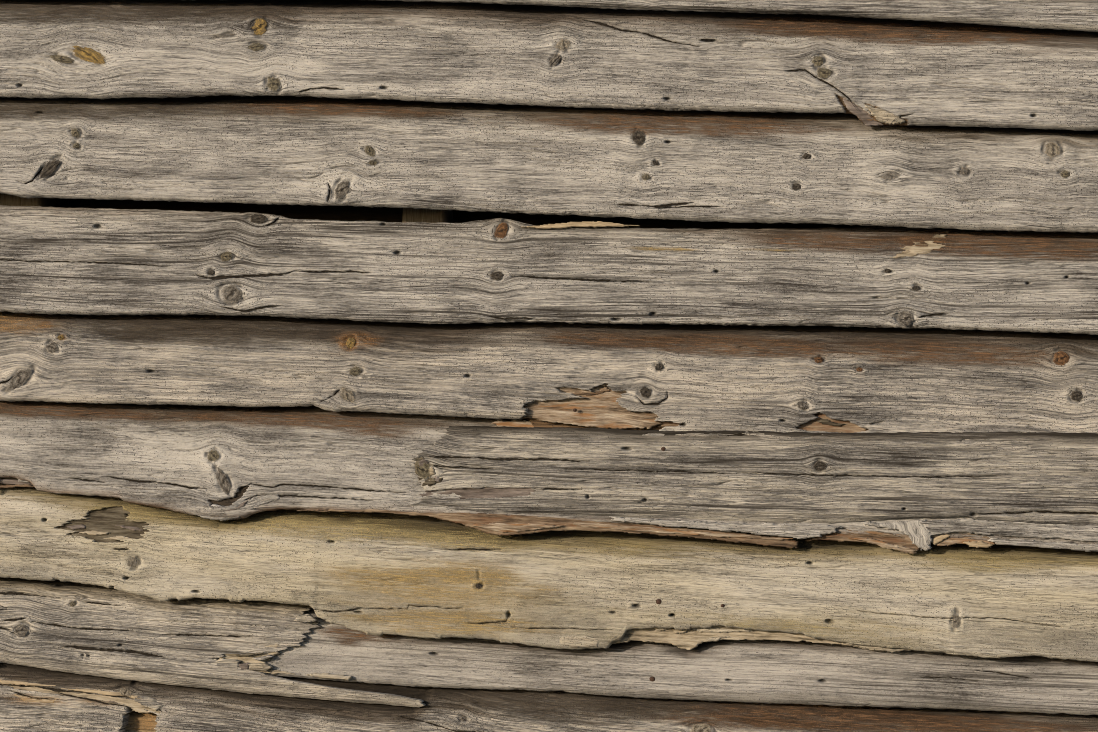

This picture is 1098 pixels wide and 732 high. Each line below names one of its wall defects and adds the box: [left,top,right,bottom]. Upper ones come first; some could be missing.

crack [790,69,857,110]
crack [239,484,403,501]
peeling [56,502,149,542]
peeling [471,522,793,541]
peeling [850,529,918,554]
peeling [0,679,163,713]